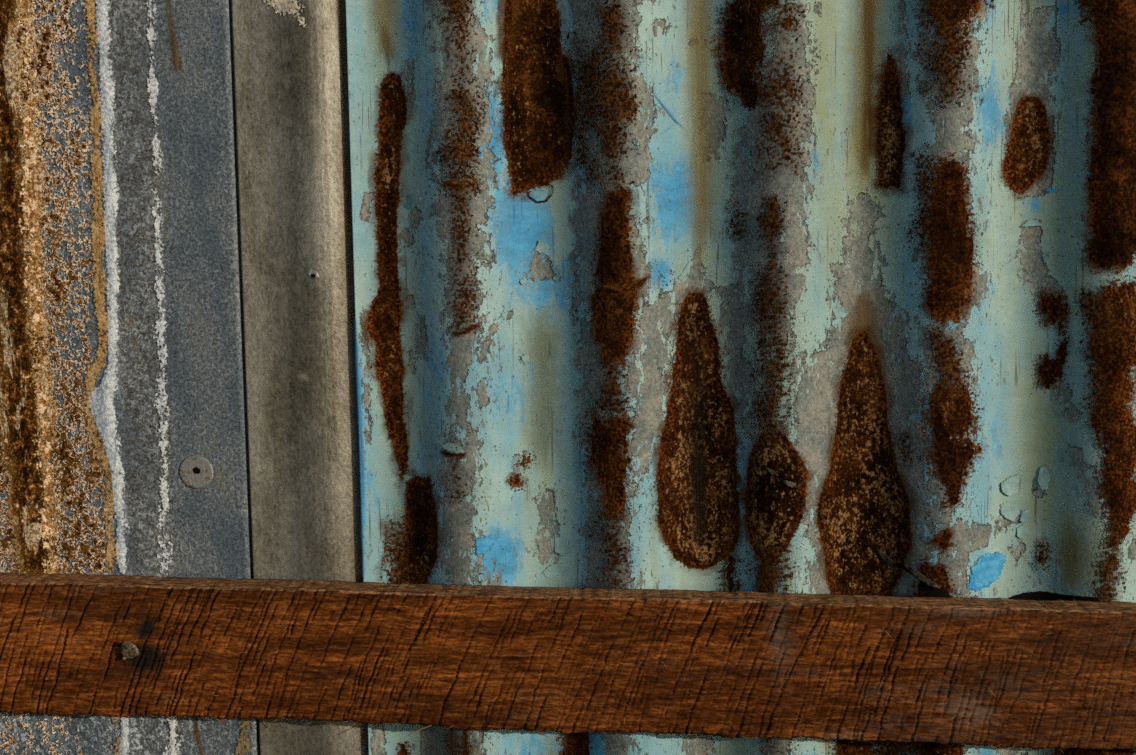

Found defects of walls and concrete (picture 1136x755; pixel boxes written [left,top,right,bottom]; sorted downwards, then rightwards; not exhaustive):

corrosion [0,0,129,575]
corrosion [363,72,471,584]
peeling [398,0,517,586]
corrosion [433,0,486,338]
corrosion [498,0,644,589]
peeling [520,0,1108,598]
corrosion [652,0,996,598]
corrosion [1001,92,1054,196]
corrosion [1030,0,1136,601]
corrosion [396,740,413,755]
corrosion [558,732,595,755]
corrosion [826,739,974,755]